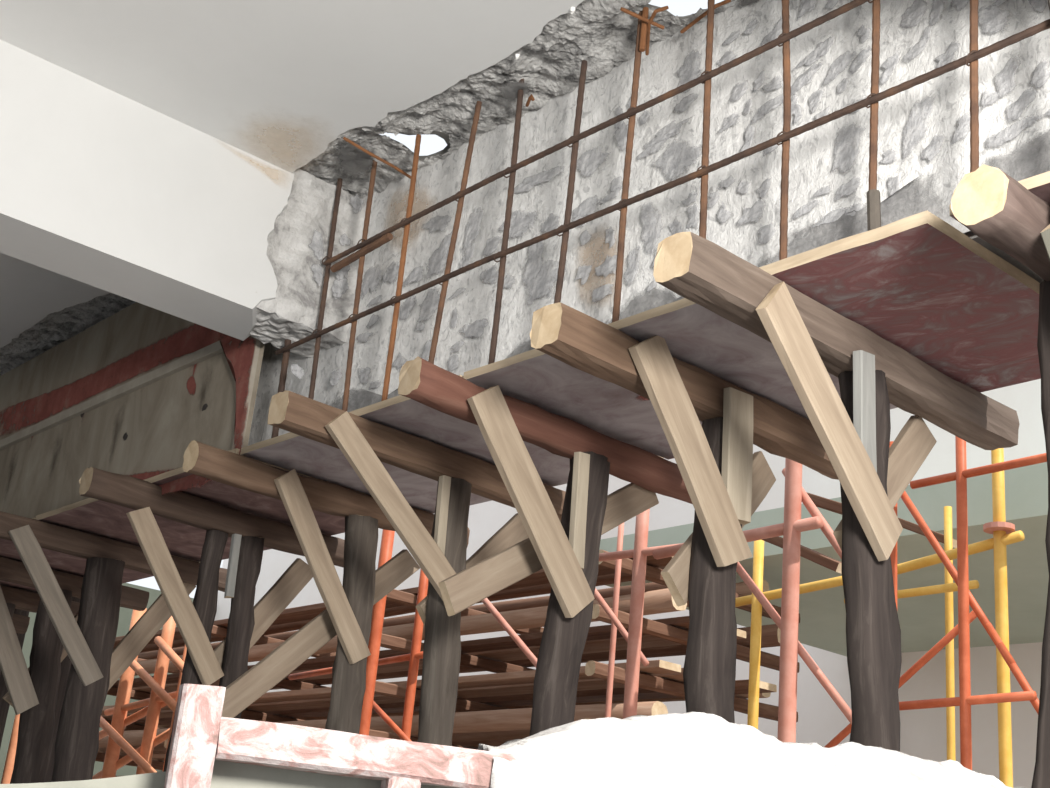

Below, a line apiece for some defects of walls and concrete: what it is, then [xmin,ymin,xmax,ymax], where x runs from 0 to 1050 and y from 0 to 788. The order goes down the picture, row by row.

spalling [0,293,136,376]
spalling [249,0,1050,412]